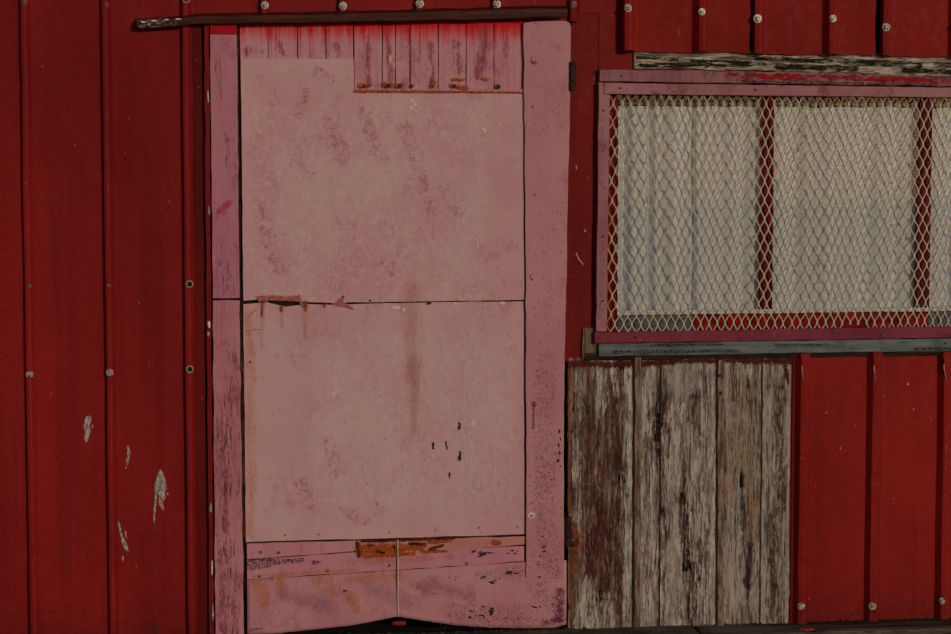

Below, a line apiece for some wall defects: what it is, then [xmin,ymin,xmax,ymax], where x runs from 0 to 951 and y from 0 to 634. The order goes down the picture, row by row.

corrosion [354,77,523,93]
peeling [726,72,951,84]
corrosion [255,295,308,317]
peeling [83,416,93,443]
peeling [153,469,169,522]
peeling [557,355,809,629]
peeling [118,521,129,560]
corrosion [356,540,452,559]